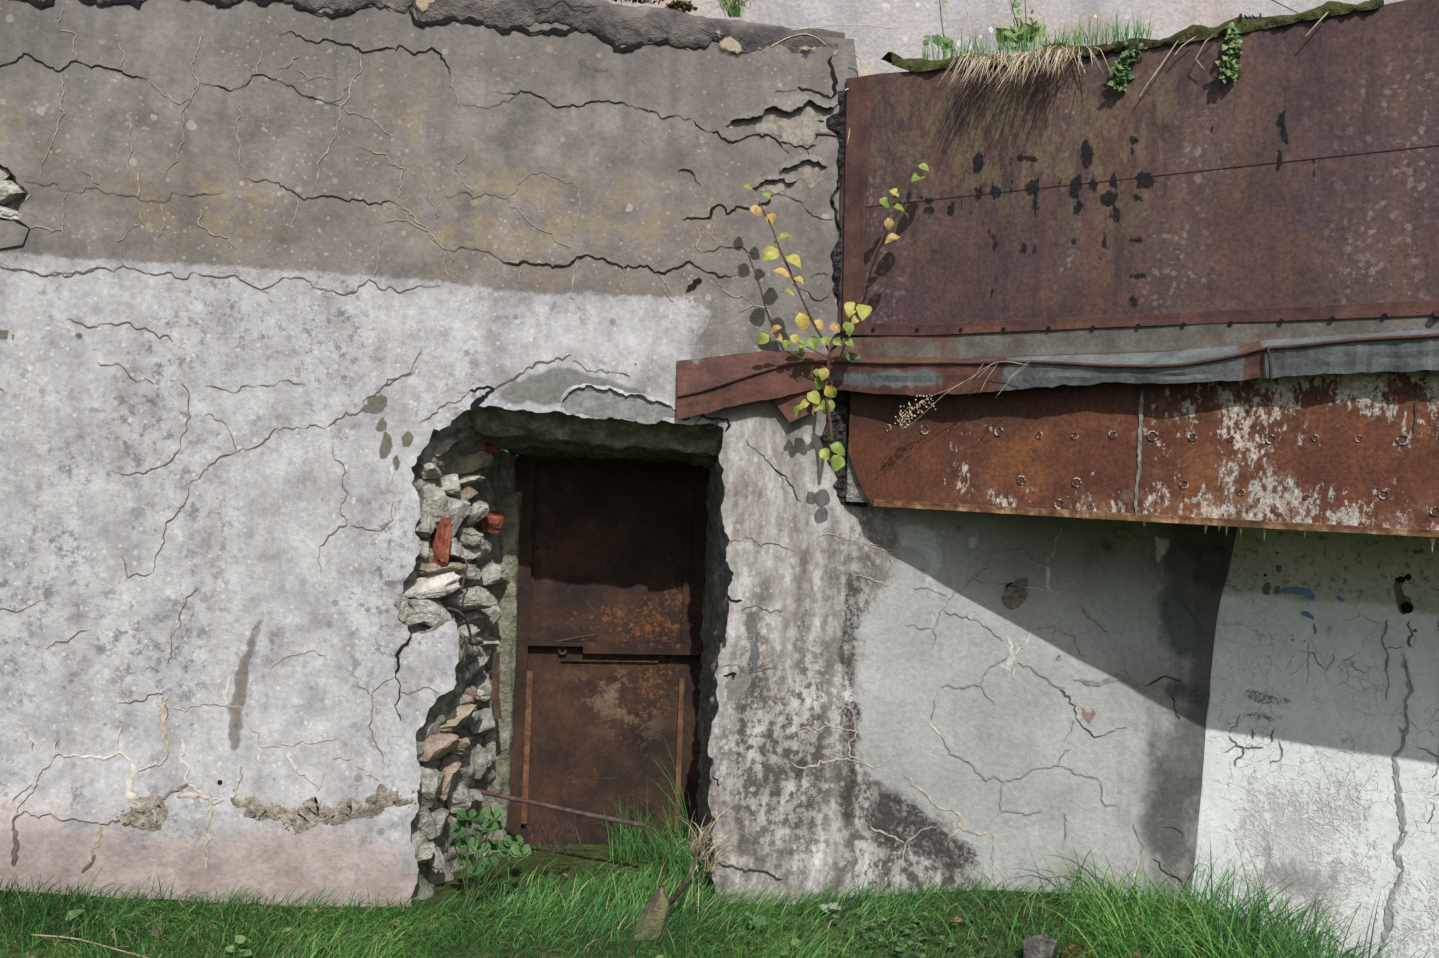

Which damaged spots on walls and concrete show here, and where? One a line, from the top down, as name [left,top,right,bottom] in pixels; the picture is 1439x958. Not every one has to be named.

spalling [0,164,29,249]
crack [0,0,838,331]
flaking render [725,94,839,194]
crack [421,354,629,422]
spalling [502,368,677,424]
leakage [1155,536,1169,561]
crack [11,588,437,873]
leakage [747,637,759,676]
leakage [839,571,977,866]
crack [723,526,1184,882]
leakage [1147,769,1194,863]
crack [1306,619,1439,958]